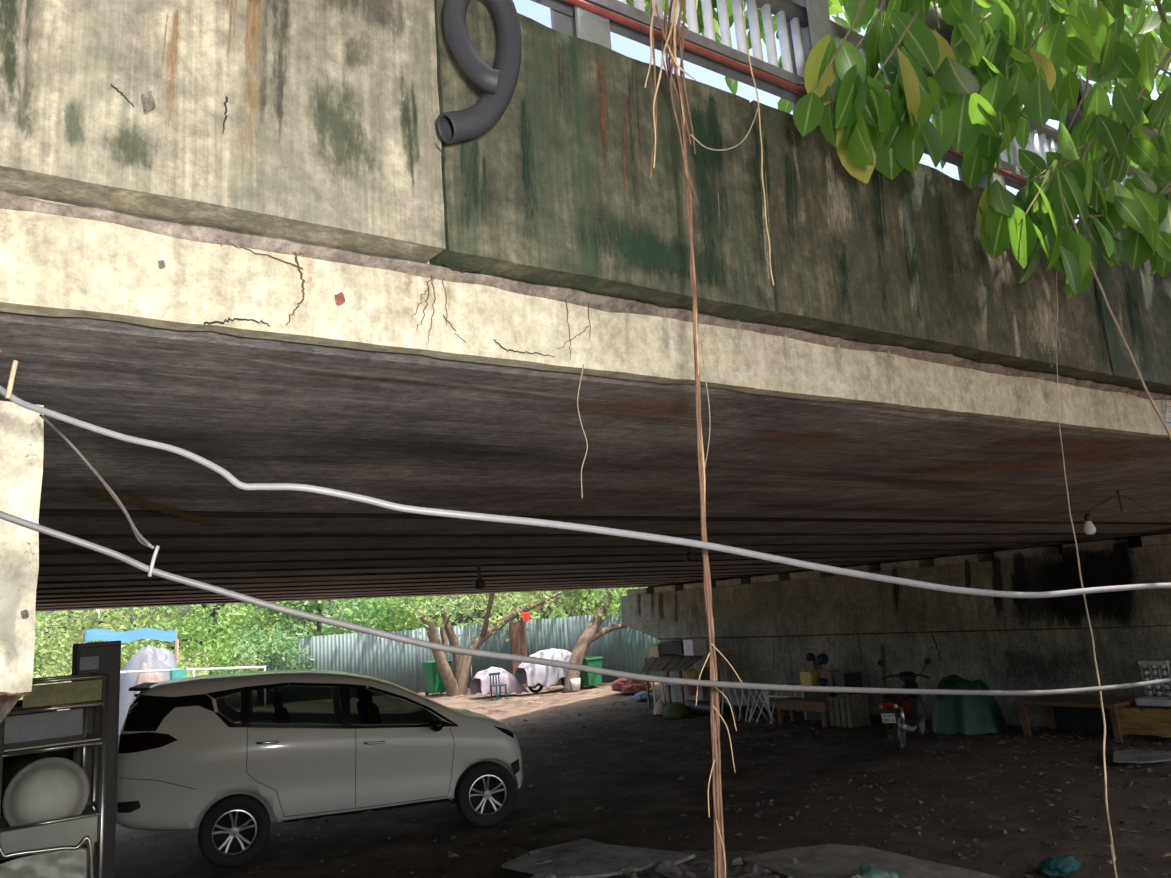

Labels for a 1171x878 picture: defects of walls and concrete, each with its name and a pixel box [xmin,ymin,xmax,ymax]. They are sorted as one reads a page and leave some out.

leakage [0,0,56,131]
corrosion [163,10,178,109]
leakage [401,78,436,219]
leakage [461,141,487,228]
leakage [522,100,535,220]
leakage [692,95,727,283]
leakage [754,124,771,279]
leakage [873,168,886,259]
crack [204,240,305,326]
crack [413,255,484,342]
crack [494,299,591,360]
leakage [992,542,1133,626]